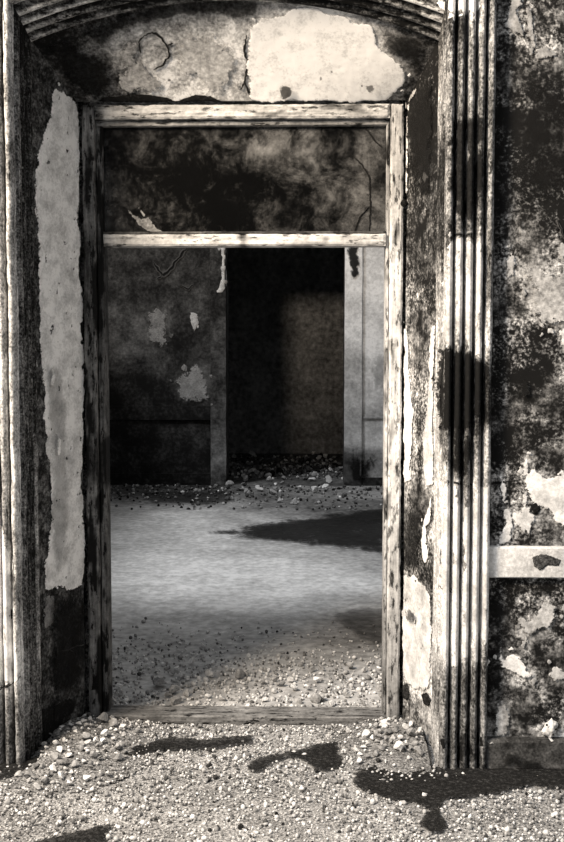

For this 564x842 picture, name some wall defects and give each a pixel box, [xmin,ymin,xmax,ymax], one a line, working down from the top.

crack [138,32,173,70]
peeling [99,34,239,102]
crack [240,35,253,101]
peeling [246,7,416,193]
water stain [408,81,431,193]
water stain [523,87,564,193]
crack [153,248,194,291]
peeling [217,248,227,292]
water stain [347,248,360,277]
peeling [35,82,87,628]
peeling [0,513,24,684]
peeling [400,451,564,706]